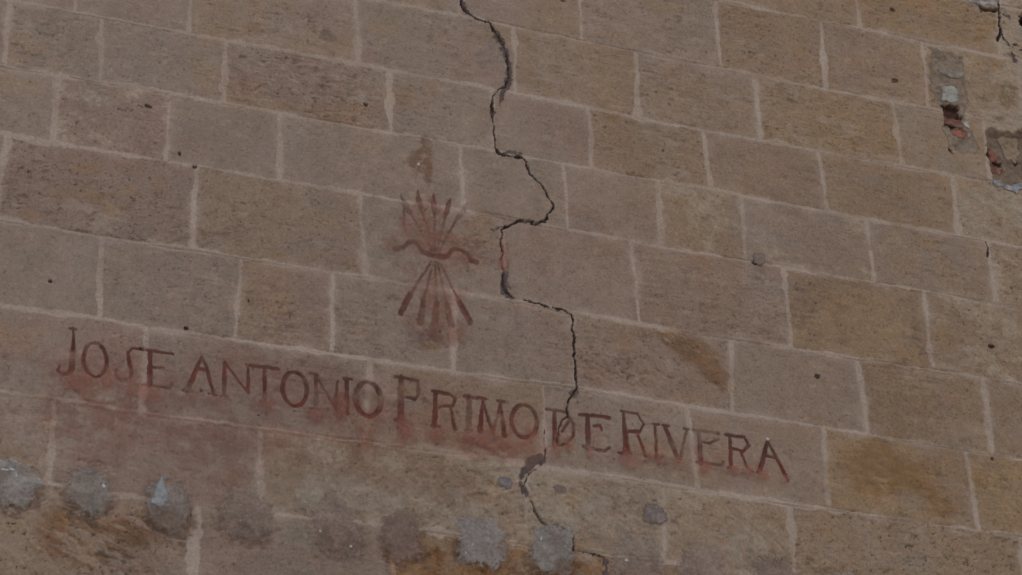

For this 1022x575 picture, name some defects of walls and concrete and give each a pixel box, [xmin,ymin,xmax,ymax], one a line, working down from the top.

crack [460,0,609,575]
spalling [930,49,1022,194]